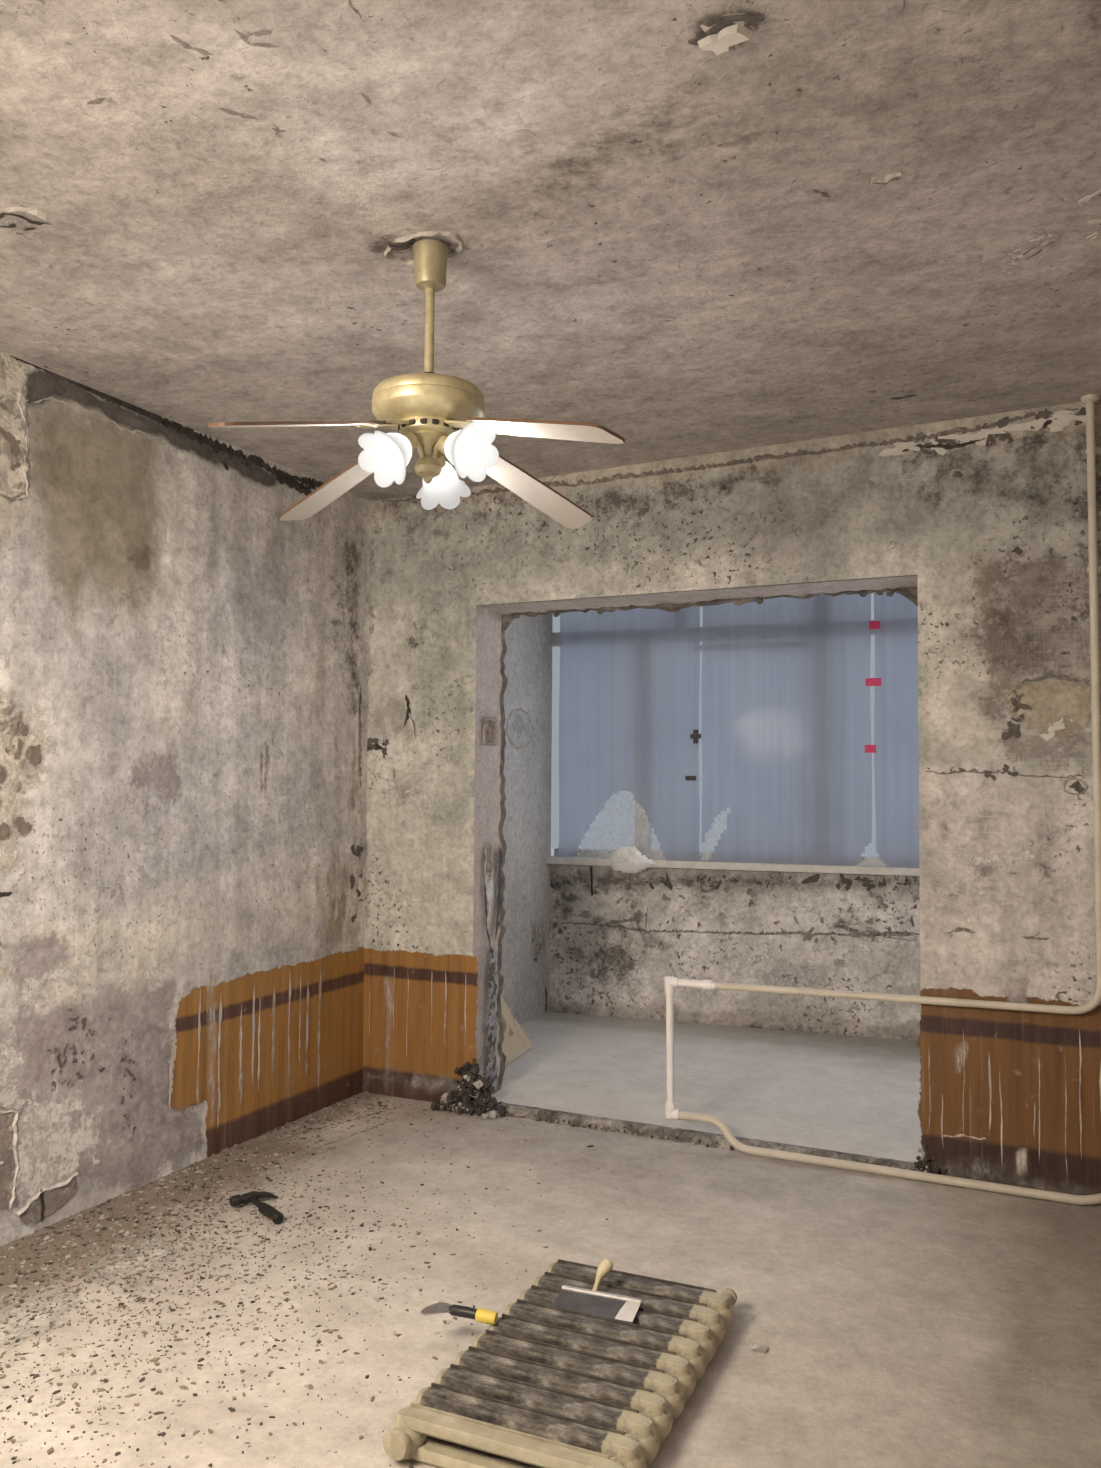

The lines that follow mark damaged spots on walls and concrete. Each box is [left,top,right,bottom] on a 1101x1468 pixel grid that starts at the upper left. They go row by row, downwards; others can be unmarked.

spalling [688,13,765,56]
leakage [32,406,155,601]
flaking render [0,351,277,502]
leakage [377,495,449,536]
leakage [665,465,779,503]
leakage [914,434,1101,545]
leakage [970,554,1101,719]
peeling [0,690,52,873]
peeling [999,674,1091,795]
peeling [47,1008,200,1157]
flaking render [0,1108,78,1234]